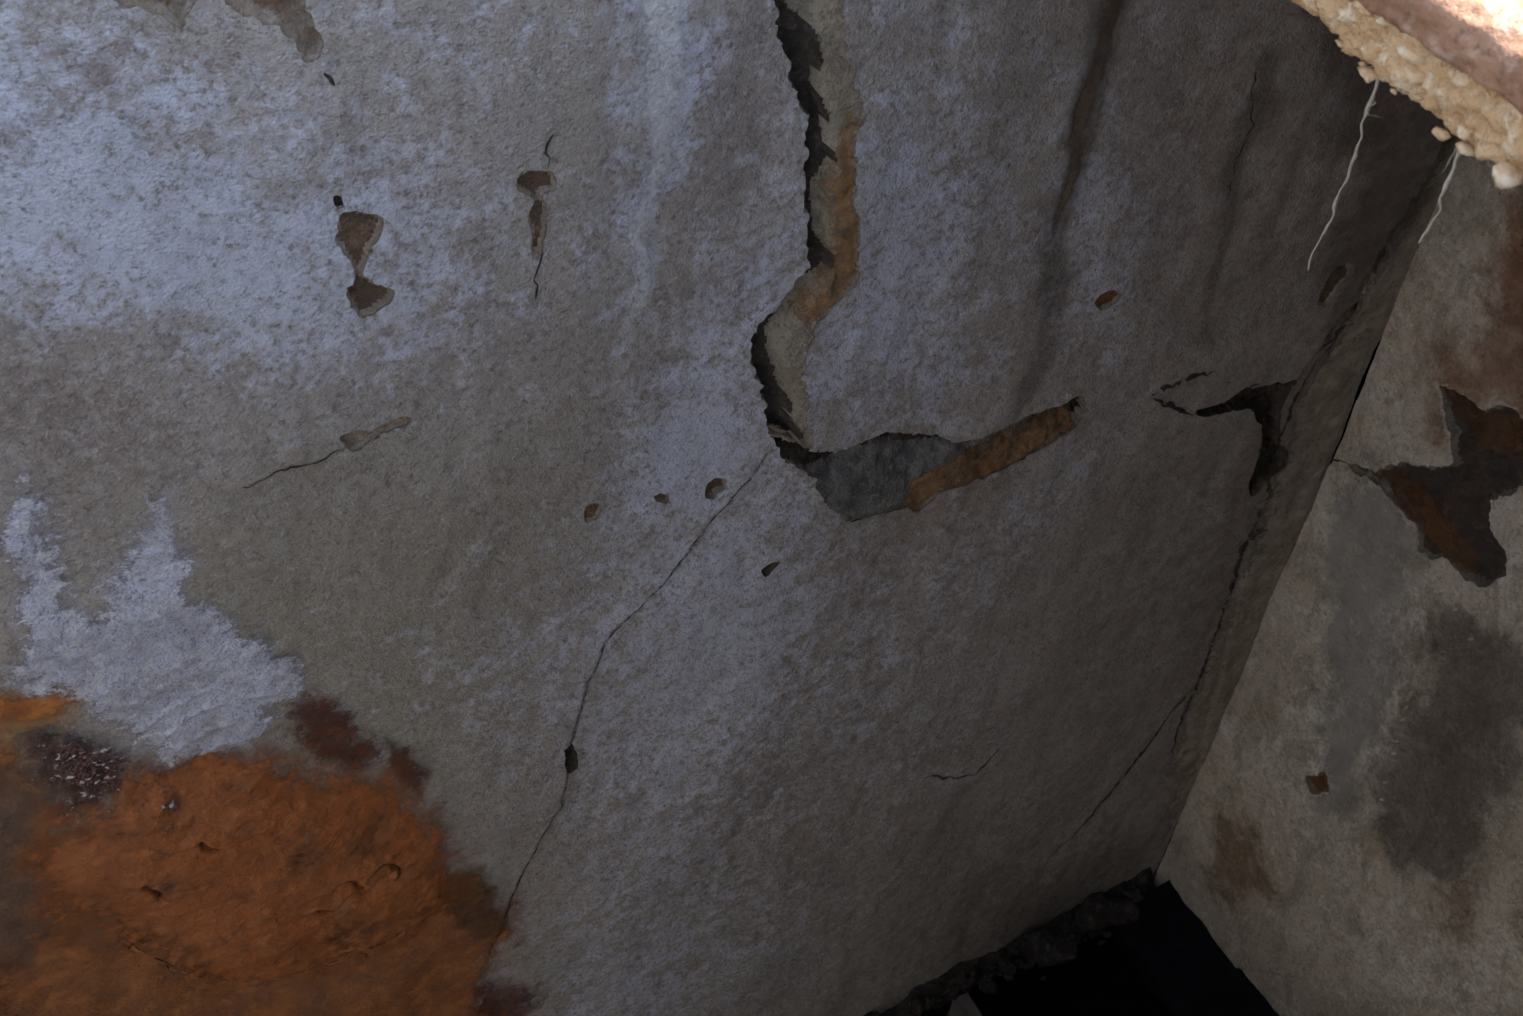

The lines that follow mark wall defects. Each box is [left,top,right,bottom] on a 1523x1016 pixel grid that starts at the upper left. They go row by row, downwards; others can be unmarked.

spalling [113,0,198,29]
spalling [224,0,324,63]
peeling [333,195,395,318]
peeling [516,170,557,260]
crack [488,0,867,955]
peeling [1346,385,1523,588]
leakage [0,474,304,769]
rust [28,732,138,814]
rust [289,693,431,797]
rust [441,872,502,938]